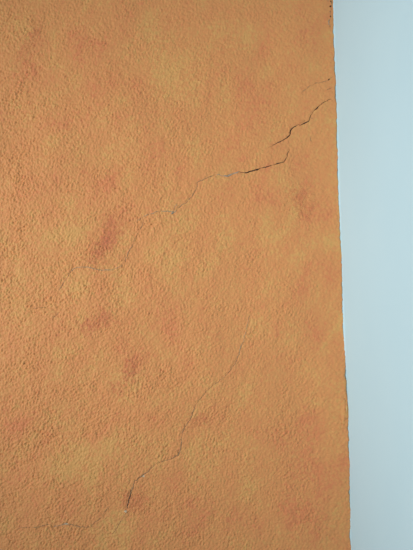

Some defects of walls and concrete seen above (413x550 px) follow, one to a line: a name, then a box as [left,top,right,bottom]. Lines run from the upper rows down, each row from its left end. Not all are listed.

crack [272,77,332,146]
crack [59,153,288,290]
crack [112,316,250,534]